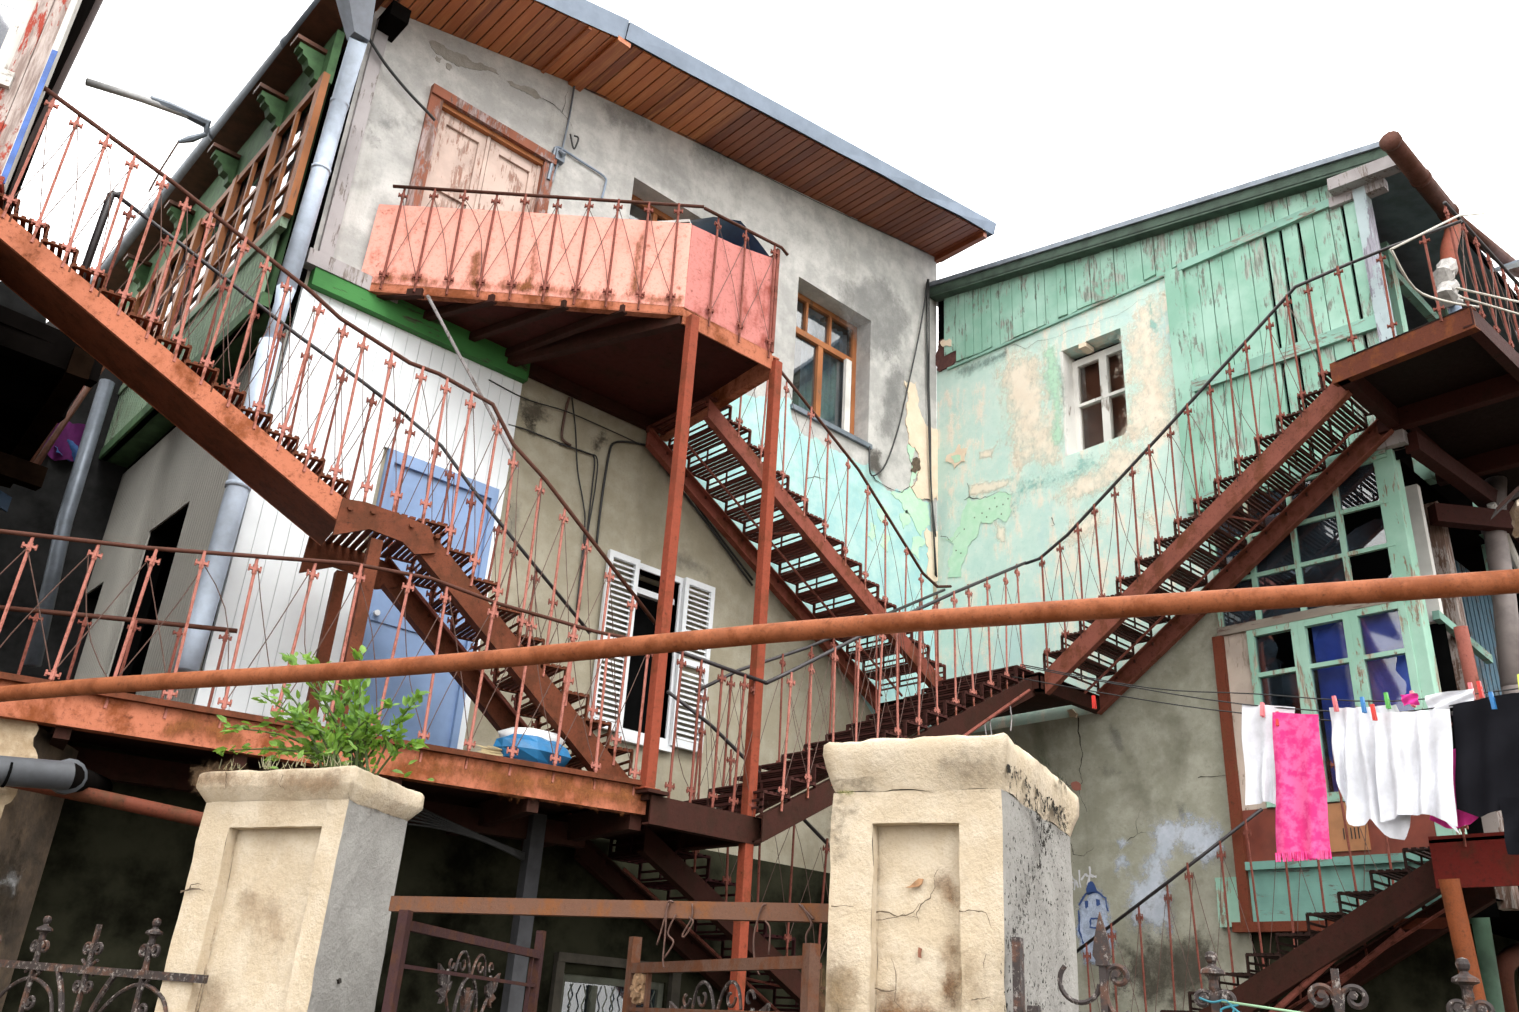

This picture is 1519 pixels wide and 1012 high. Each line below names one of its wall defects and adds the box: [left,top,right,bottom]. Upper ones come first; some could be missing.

corrosion [470,250,613,299]
corrosion [632,237,681,305]
peeling [664,299,1176,615]
peeling [837,631,935,714]
crack [831,871,991,1000]
crack [837,959,903,1012]
water stain [878,997,933,1012]
water stain [944,973,956,995]